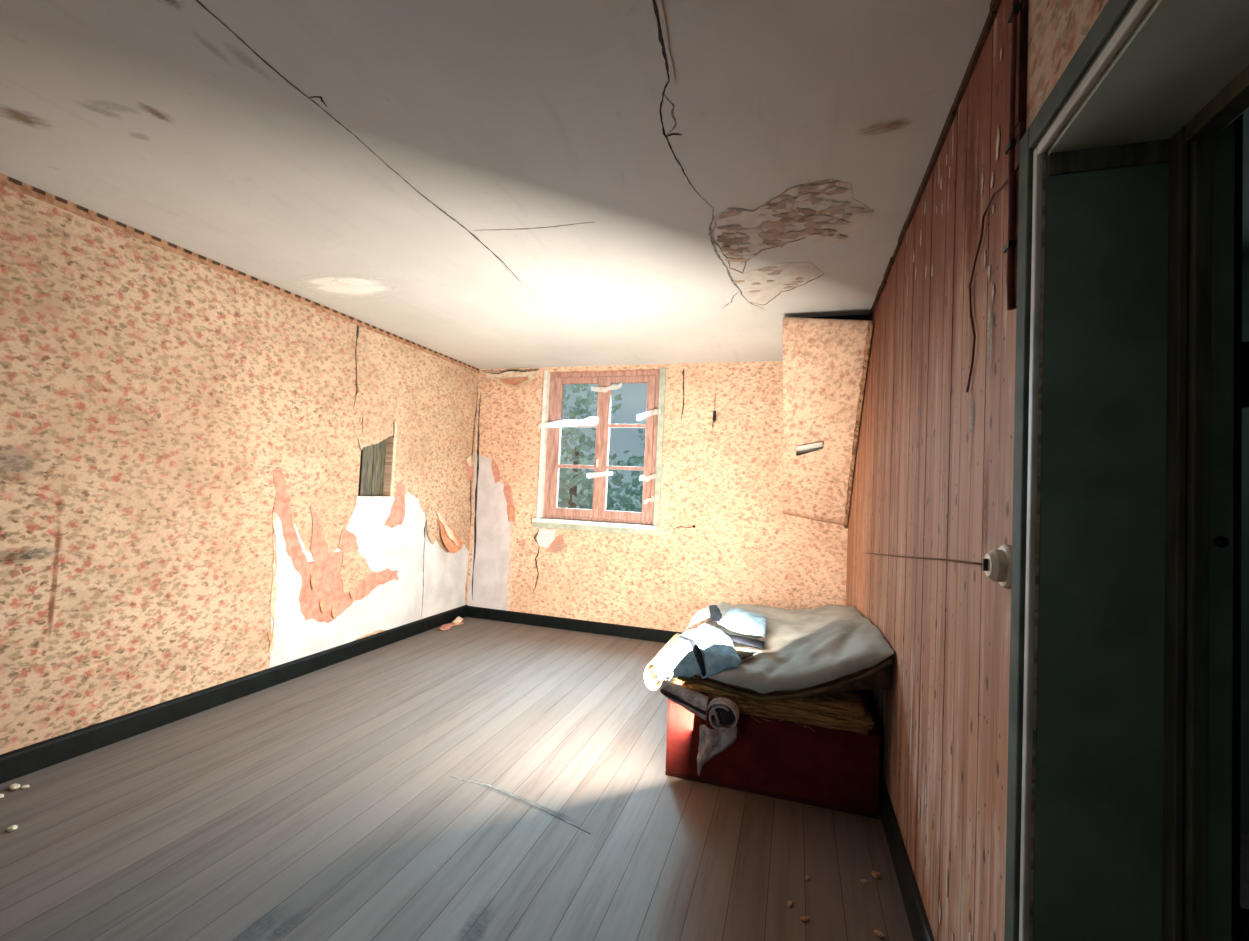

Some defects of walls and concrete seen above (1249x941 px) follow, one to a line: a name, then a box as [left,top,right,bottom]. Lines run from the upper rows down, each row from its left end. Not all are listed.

crack [196,0,593,303]
crack [652,0,763,309]
flaking render [712,180,874,305]
peeling [268,454,517,668]